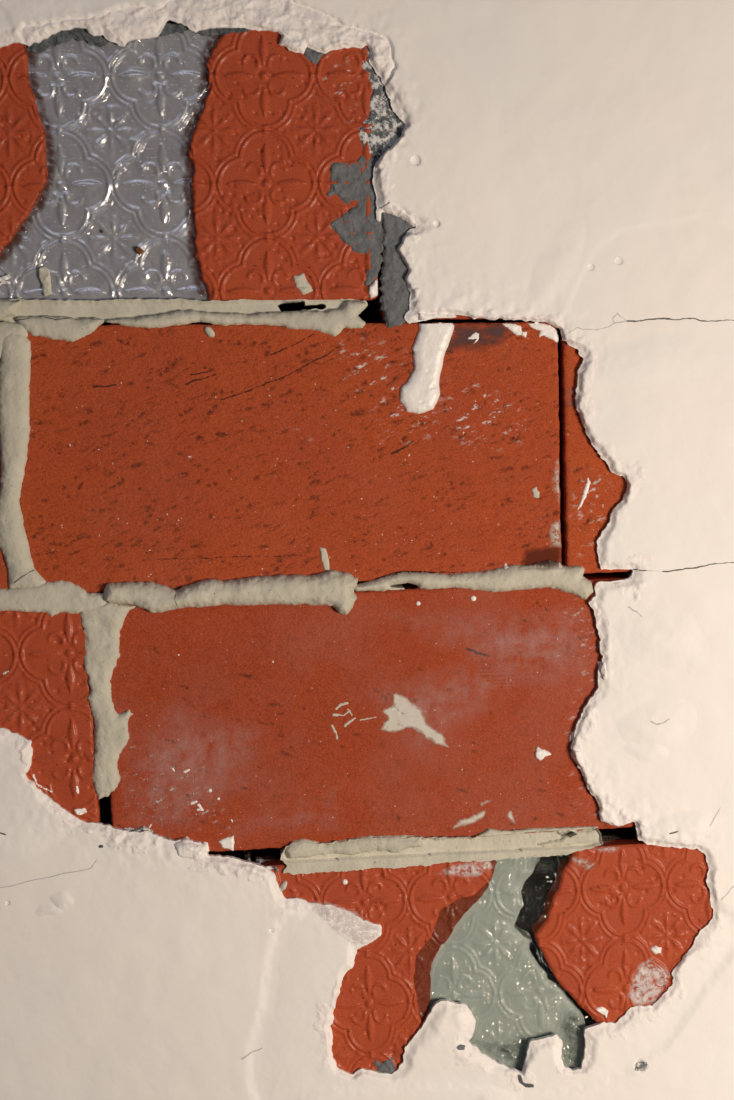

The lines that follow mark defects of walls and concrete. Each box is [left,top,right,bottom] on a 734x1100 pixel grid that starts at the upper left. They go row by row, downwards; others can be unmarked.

crack [558,313,734,338]
flaking render [0,0,704,855]
crack [623,562,734,617]
spalling [174,836,382,936]
spalling [312,944,388,1081]
spalling [451,859,727,1092]